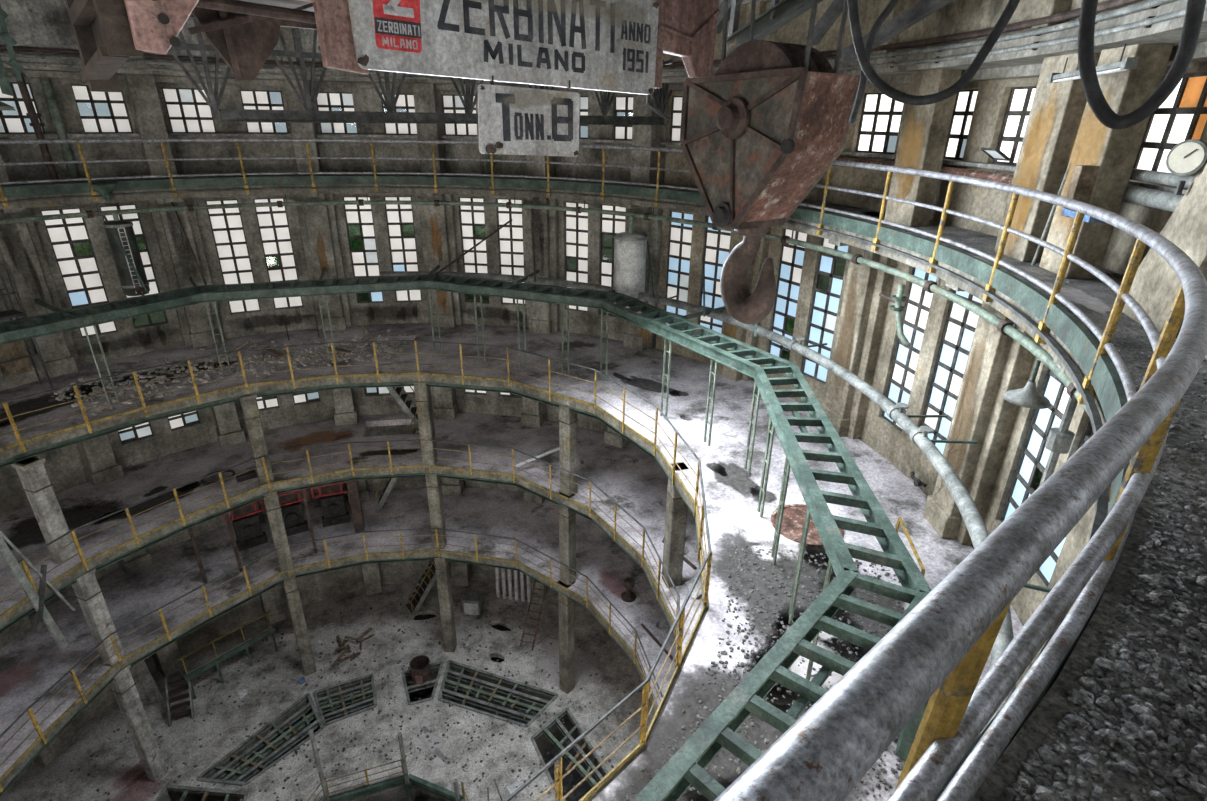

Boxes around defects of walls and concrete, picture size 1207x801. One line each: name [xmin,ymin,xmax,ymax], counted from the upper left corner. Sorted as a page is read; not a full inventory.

leakage [613,372,689,396]
leakage [617,462,843,801]
leakage [811,631,869,663]
leakage [832,573,905,638]